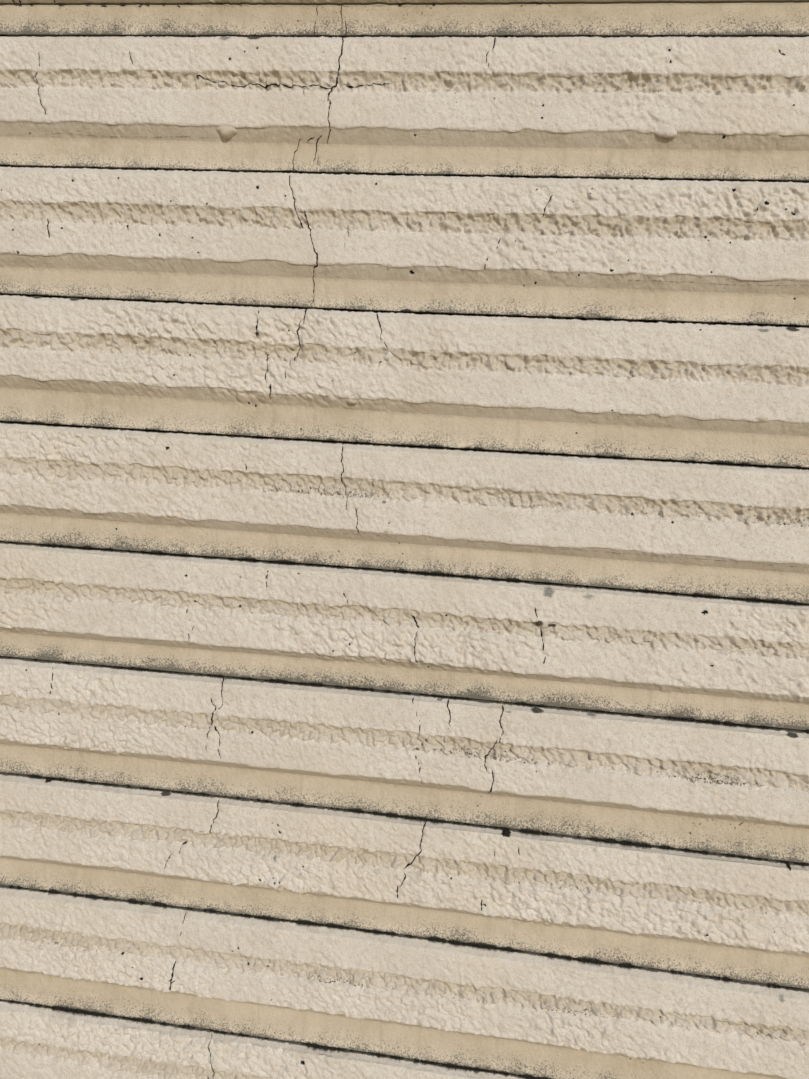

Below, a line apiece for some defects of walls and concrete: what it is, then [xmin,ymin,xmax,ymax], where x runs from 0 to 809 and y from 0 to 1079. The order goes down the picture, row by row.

crack [197,6,391,399]
crack [341,443,359,533]
crack [205,676,224,755]
crack [477,705,504,807]
crack [396,822,426,898]